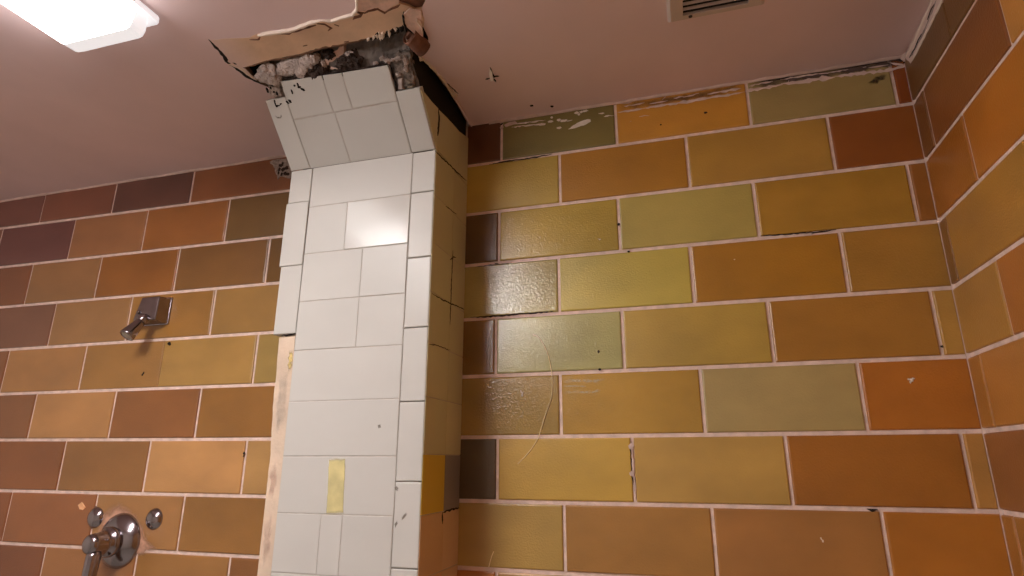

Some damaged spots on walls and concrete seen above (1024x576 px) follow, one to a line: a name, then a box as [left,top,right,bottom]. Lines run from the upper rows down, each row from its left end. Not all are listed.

peeling [257,0,358,37]
crack [762,1,936,82]
spalling [254,44,472,127]